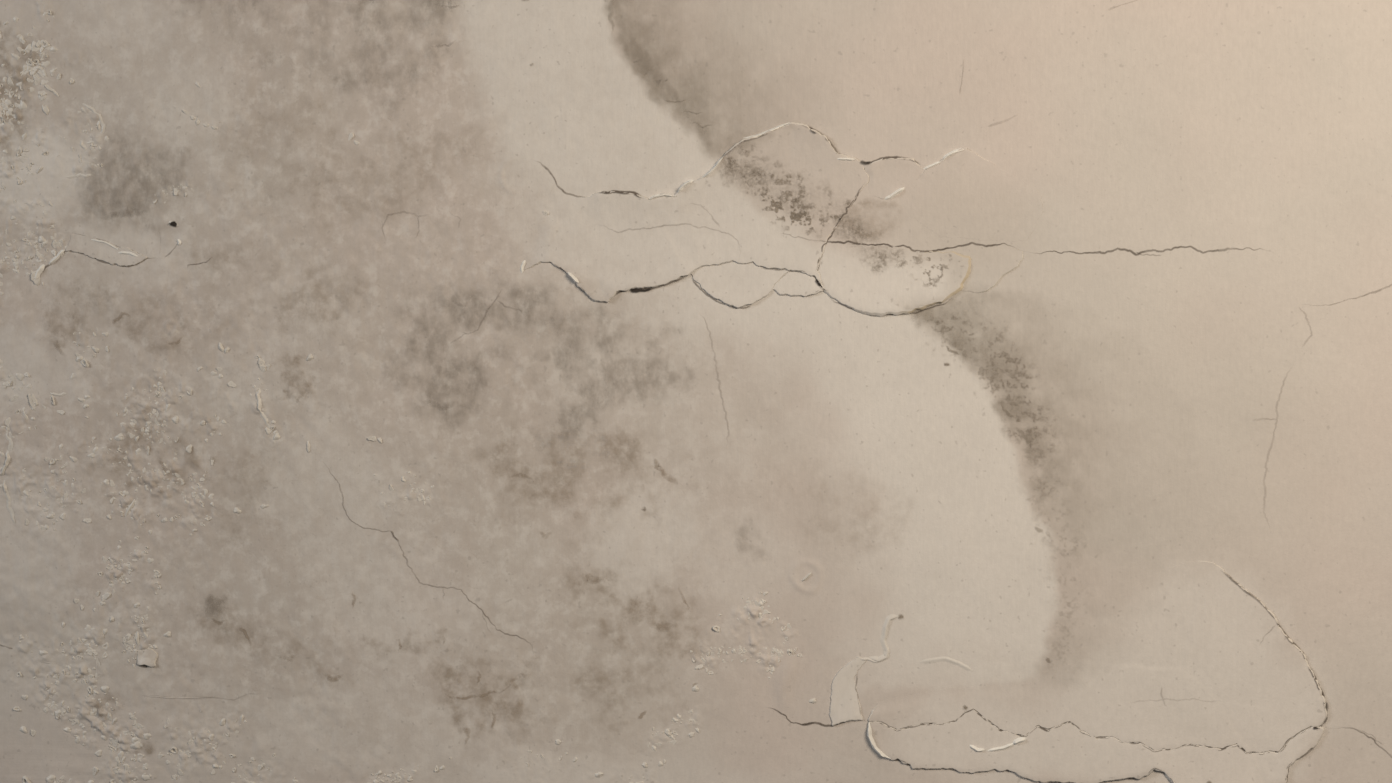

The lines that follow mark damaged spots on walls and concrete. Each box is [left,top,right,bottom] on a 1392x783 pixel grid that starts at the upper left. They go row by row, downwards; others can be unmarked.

flaking render [520,122,1043,317]
flaking render [778,561,1328,783]